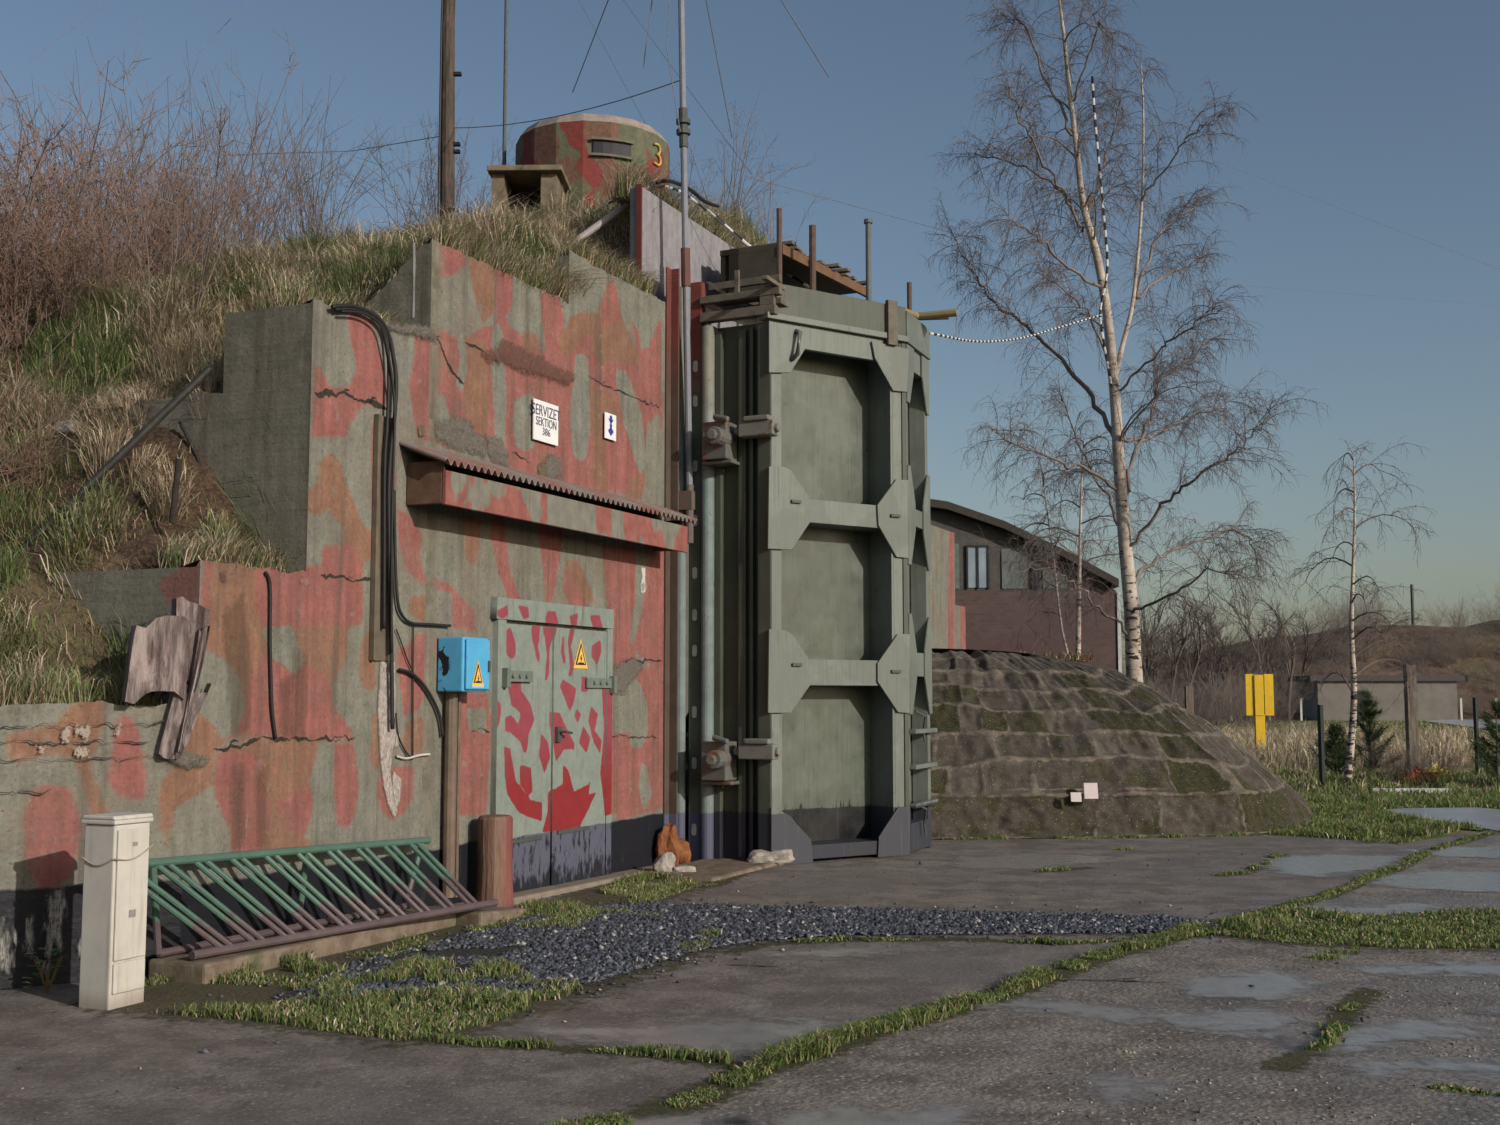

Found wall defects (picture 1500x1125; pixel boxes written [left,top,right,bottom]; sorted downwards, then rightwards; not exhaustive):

crack [436,336,486,384]
crack [315,388,386,410]
crack [589,376,660,408]
peeling [35,723,91,759]
crack [213,735,354,752]